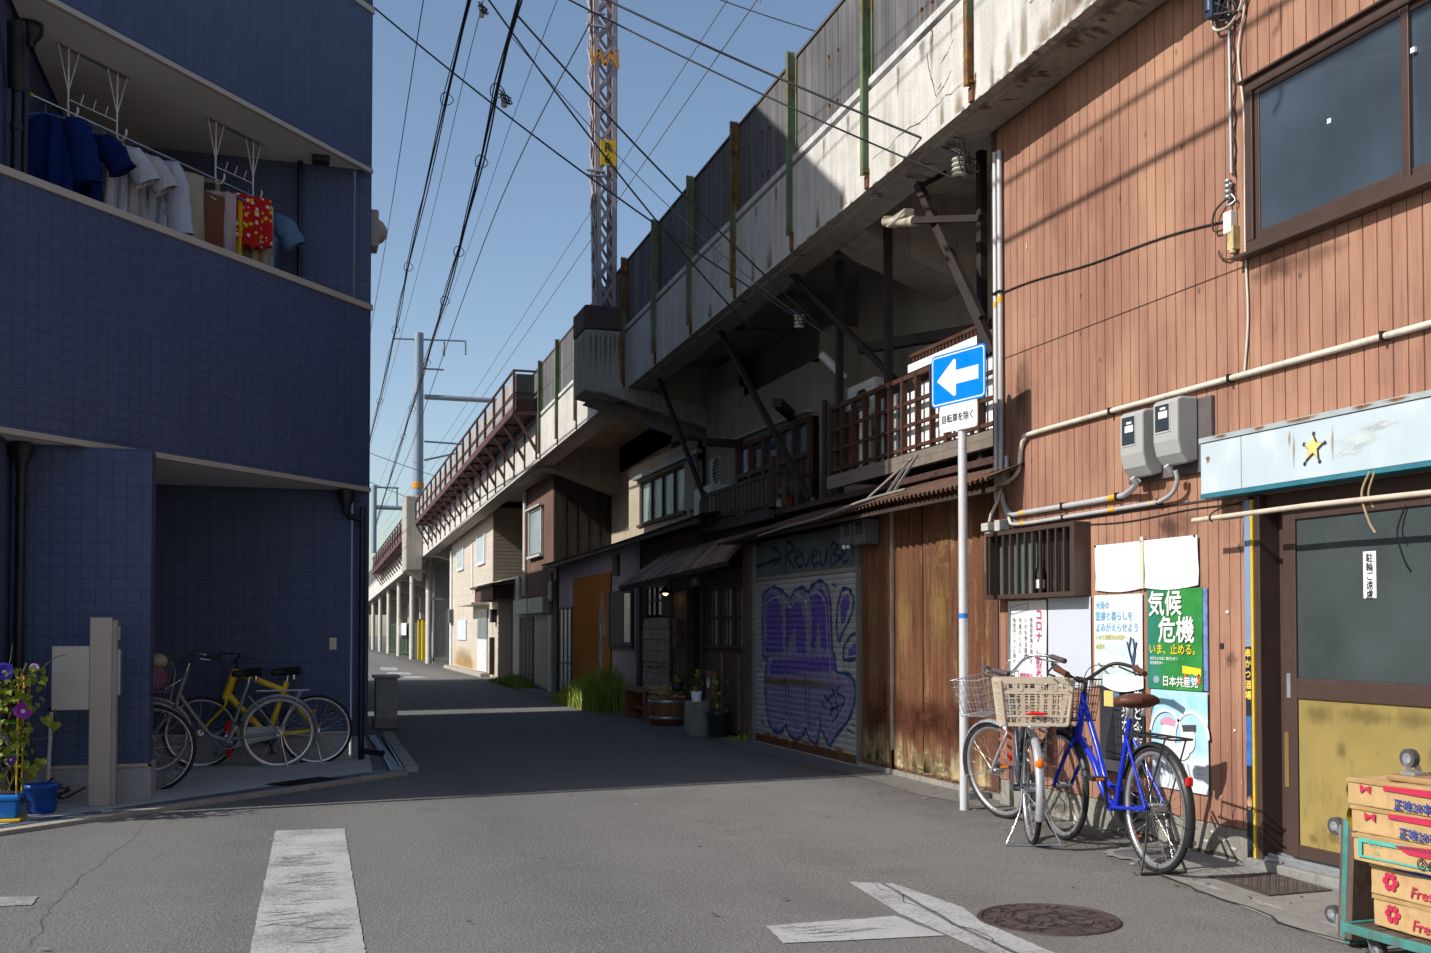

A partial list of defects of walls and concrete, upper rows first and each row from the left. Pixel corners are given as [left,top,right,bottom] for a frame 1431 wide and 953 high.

crack [876,20,963,156]
corrosion [900,606,909,649]
corrosion [868,651,983,742]